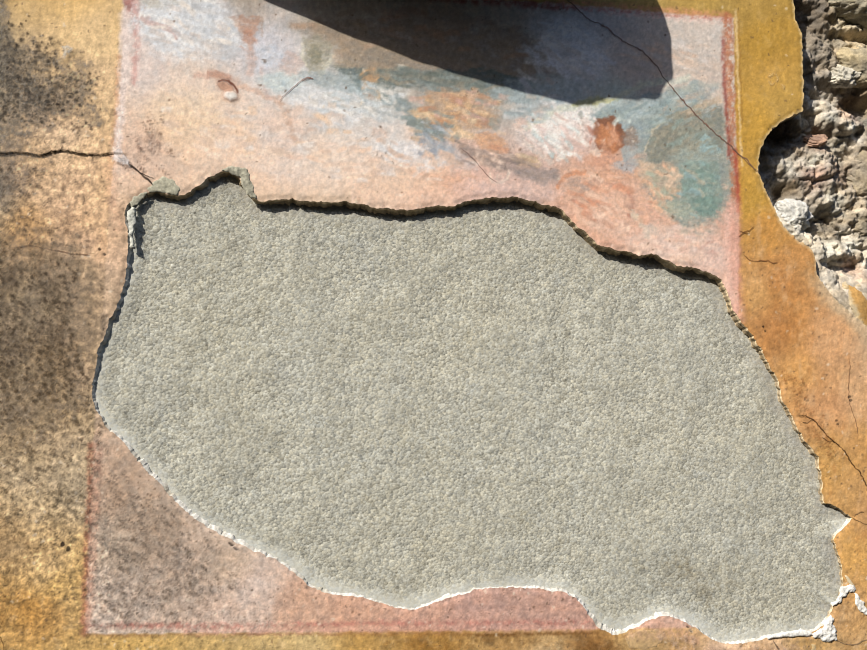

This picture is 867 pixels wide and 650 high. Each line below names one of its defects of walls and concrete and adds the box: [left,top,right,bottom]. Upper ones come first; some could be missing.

leakage [0,0,97,147]
crack [0,145,108,157]
crack [128,163,153,185]
crack [568,1,759,172]
leakage [0,161,106,517]
spalling [92,166,867,650]
crack [801,415,867,486]